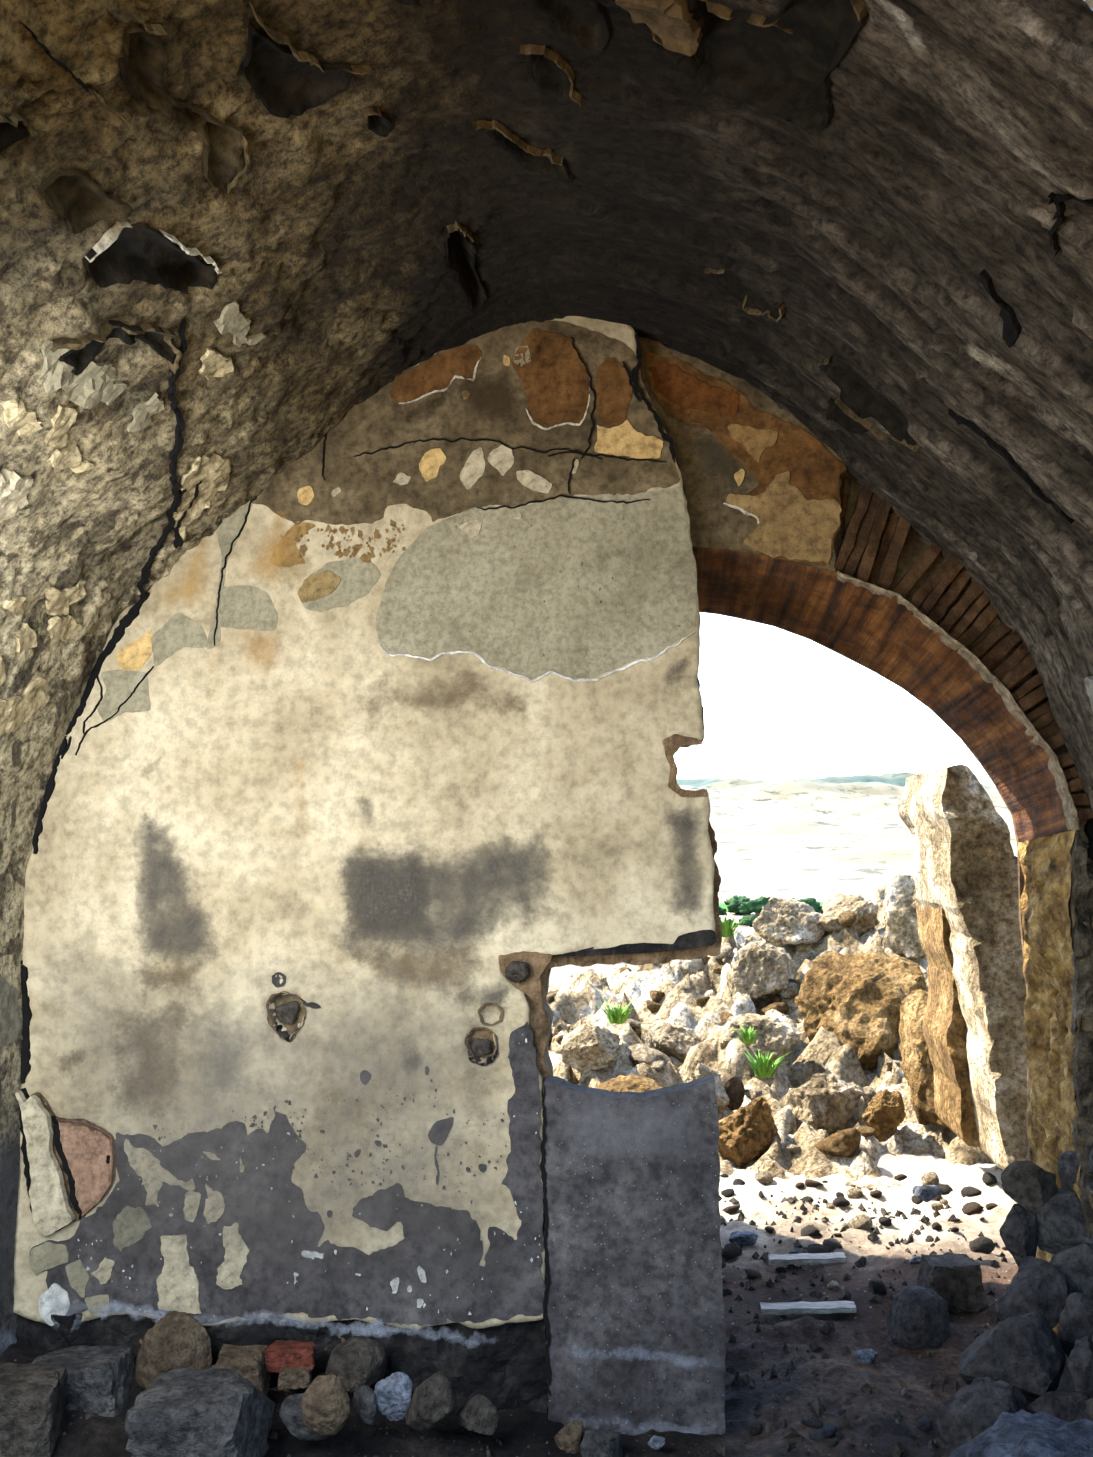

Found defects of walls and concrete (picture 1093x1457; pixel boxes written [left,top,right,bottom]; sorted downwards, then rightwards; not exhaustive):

spalling [37,168,222,294]
peeling [0,320,182,473]
peeling [198,302,267,381]
crack [322,330,675,511]
crack [32,319,202,854]
crack [214,496,257,646]
peeling [98,320,846,722]
damp [139,822,206,987]
damp [344,839,546,1003]
spalling [498,930,717,1004]
crack [19,961,32,1213]
peeling [15,1003,546,1326]